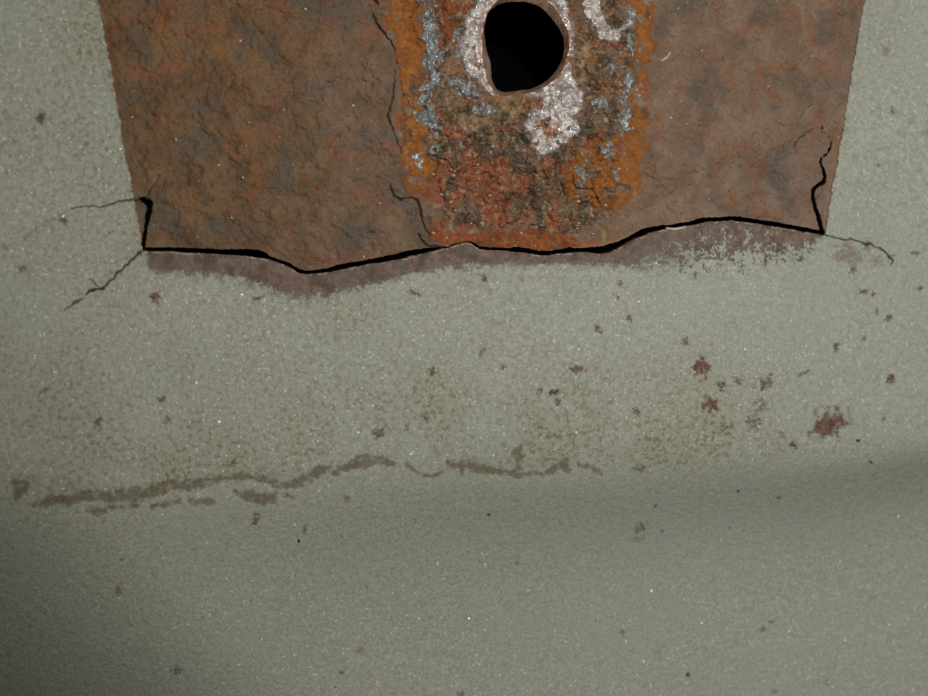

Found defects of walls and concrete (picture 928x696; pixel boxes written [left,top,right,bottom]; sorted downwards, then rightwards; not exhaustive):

crack [67,102,894,308]
rust [97,0,865,298]
rust [693,357,711,379]
rust [808,408,848,437]